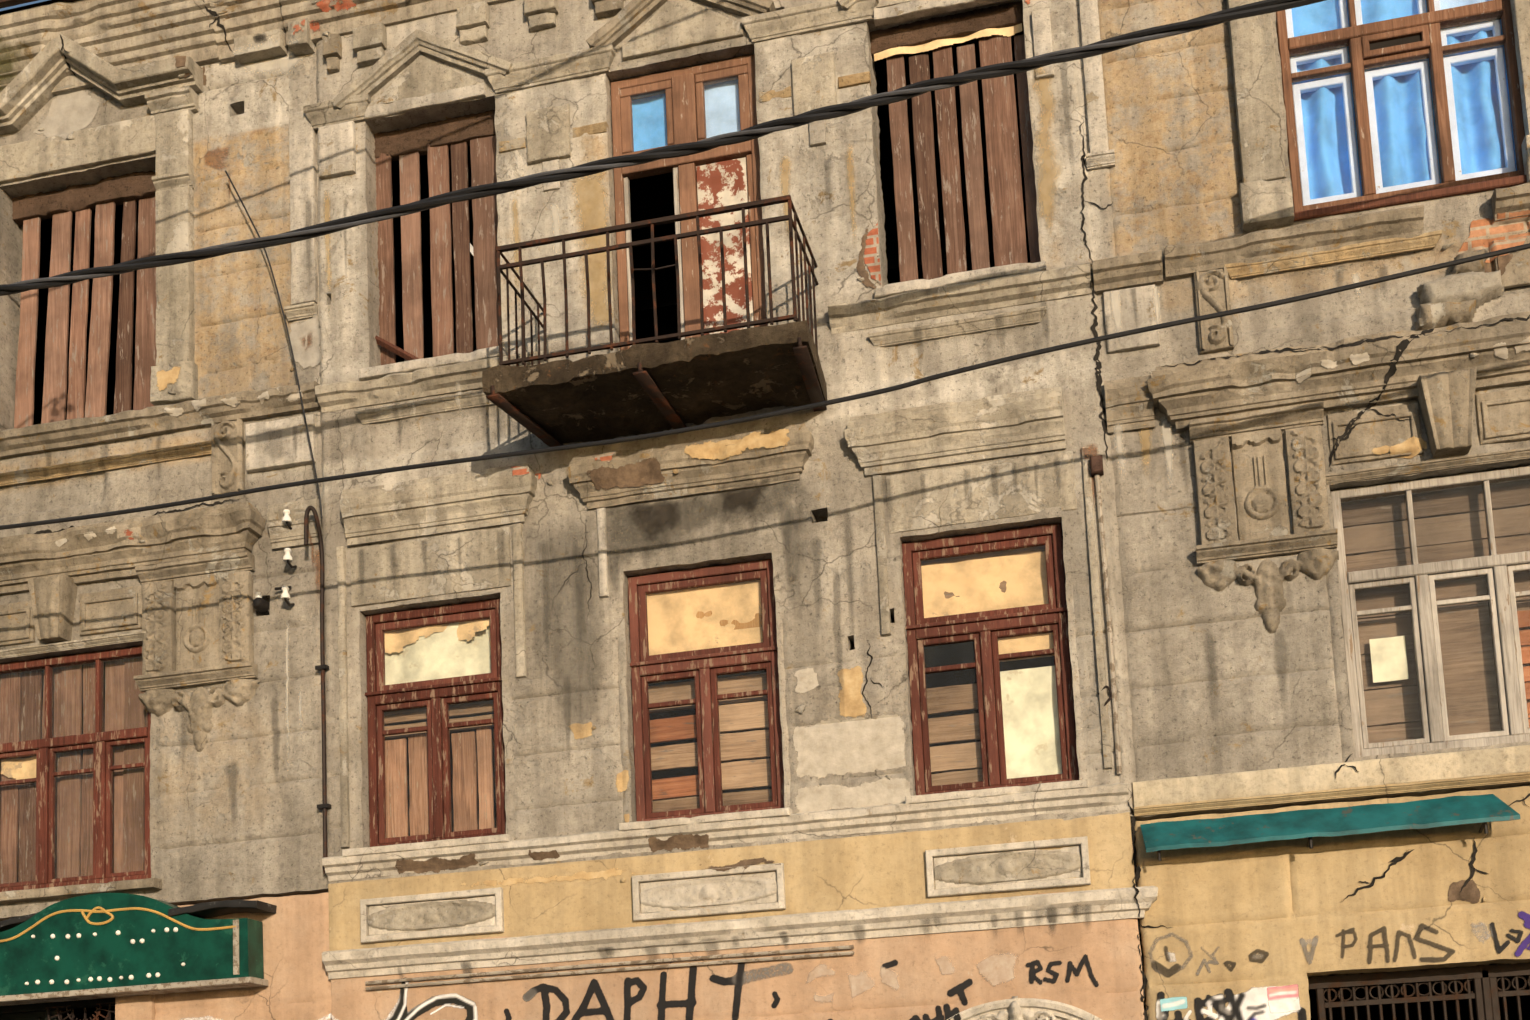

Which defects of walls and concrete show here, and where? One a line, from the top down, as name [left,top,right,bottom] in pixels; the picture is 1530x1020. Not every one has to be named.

crack [203,0,233,53]
flaking render [293,0,357,36]
flaking render [856,222,881,288]
crack [1079,122,1112,466]
crack [1161,315,1530,470]
leakage [613,478,793,552]
flaking render [793,666,912,813]
flaking render [395,850,635,887]
flaking render [646,834,709,852]
peeling [708,857,781,872]
crack [1342,849,1414,902]
crack [1459,839,1488,893]